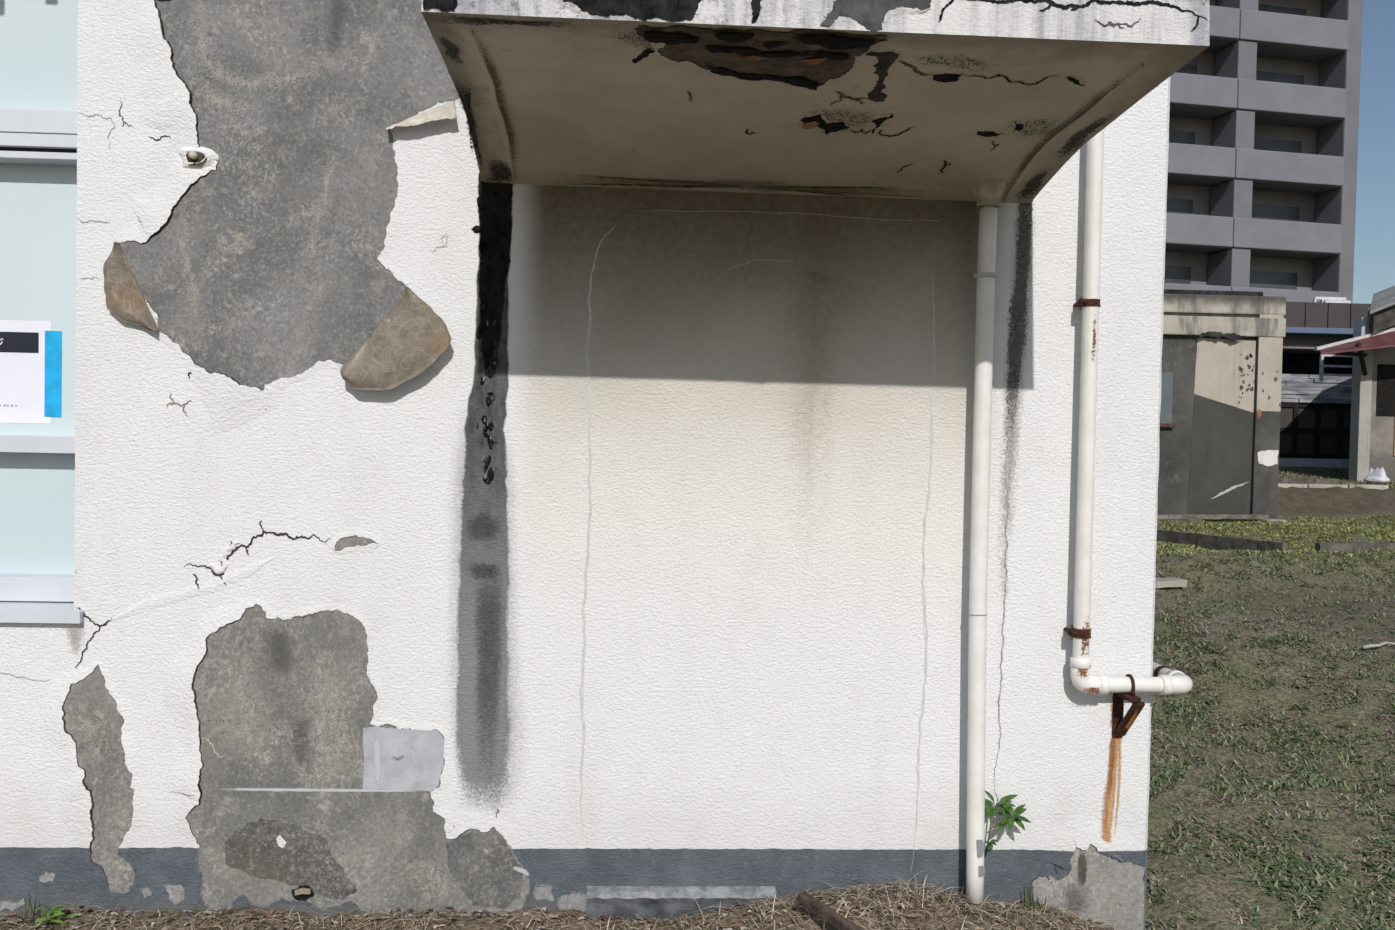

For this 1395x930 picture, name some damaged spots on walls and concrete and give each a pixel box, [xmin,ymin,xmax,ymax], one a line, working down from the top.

damp [441,16,573,63]
spalling [553,0,1086,137]
crack [939,0,1207,31]
peeling [103,0,466,433]
crack [184,520,331,589]
damp [456,80,515,797]
crack [579,225,616,838]
crack [911,281,936,867]
peeling [38,597,587,918]
corrosion [1071,622,1139,843]
peeling [1025,814,1145,930]